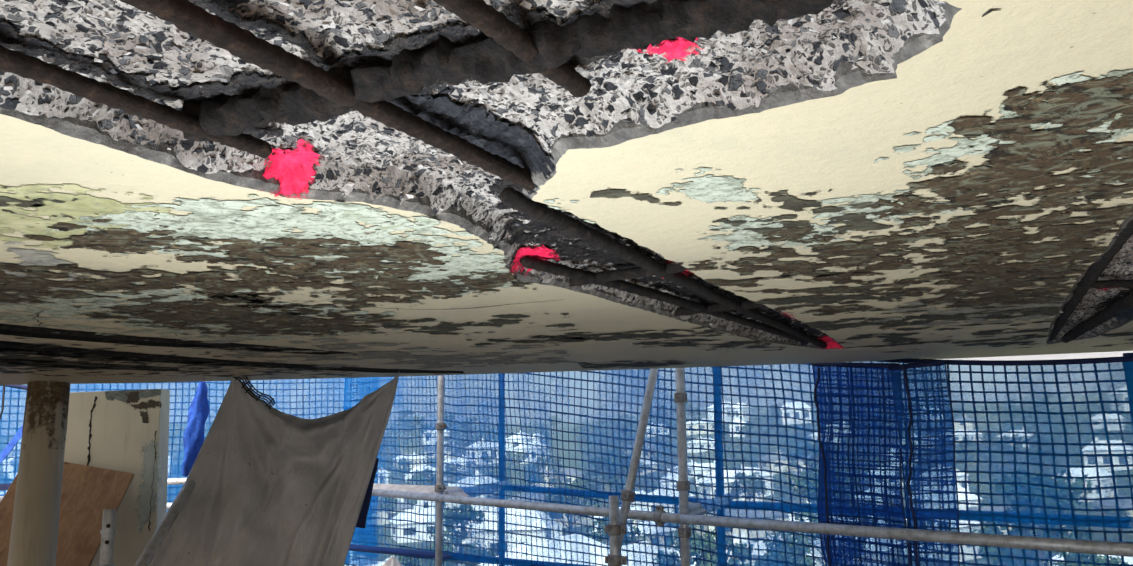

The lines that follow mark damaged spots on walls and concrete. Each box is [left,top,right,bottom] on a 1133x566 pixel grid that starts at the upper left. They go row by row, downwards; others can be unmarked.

spalling [0,0,1133,373]
leakage [804,295,1067,353]
leakage [1081,332,1133,347]
crack [87,396,98,466]